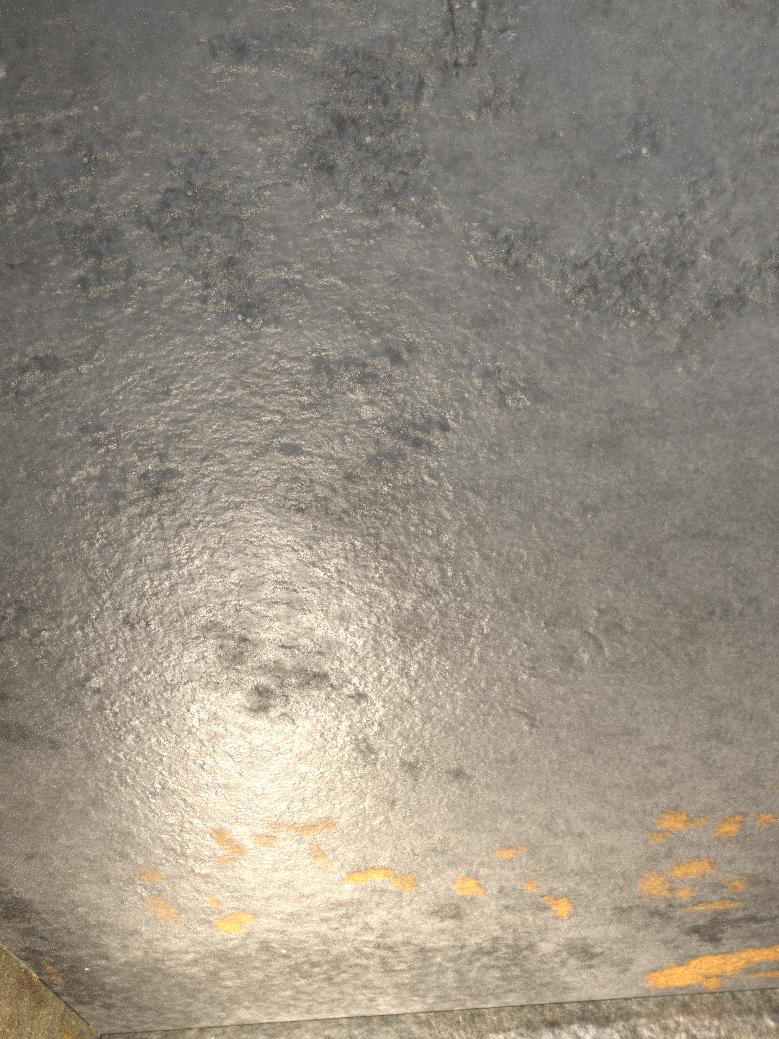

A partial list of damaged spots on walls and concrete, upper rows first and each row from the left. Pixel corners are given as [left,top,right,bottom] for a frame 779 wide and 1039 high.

corrosion [655,813,705,839]
corrosion [348,869,409,888]
corrosion [645,862,711,892]
corrosion [542,897,571,915]
leakage [40,933,360,1019]
leakage [387,953,539,1002]
corrosion [650,945,779,989]